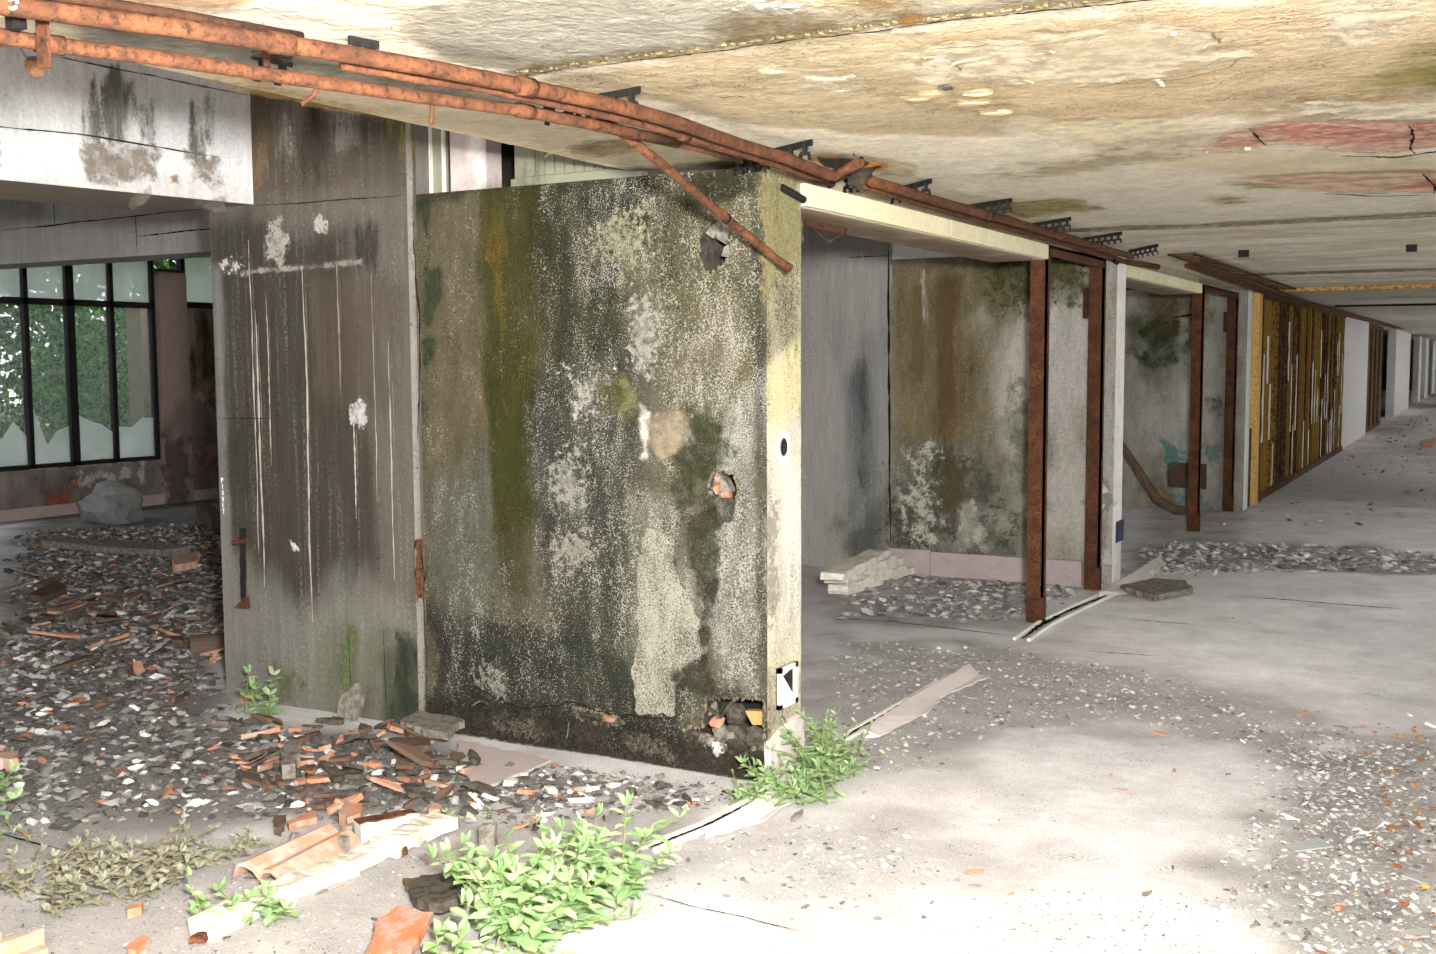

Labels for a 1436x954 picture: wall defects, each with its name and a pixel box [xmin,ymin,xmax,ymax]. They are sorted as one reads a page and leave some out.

spalling [127,0,245,12]
peeling [350,0,452,9]
corrosion [897,14,923,25]
leakage [80,66,161,184]
leakage [186,97,219,182]
corrosion [811,155,888,174]
spalling [1192,118,1436,197]
spalling [697,218,733,277]
leakage [557,188,663,421]
leakage [544,438,599,575]
leakage [667,405,737,700]
peeling [424,527,774,782]